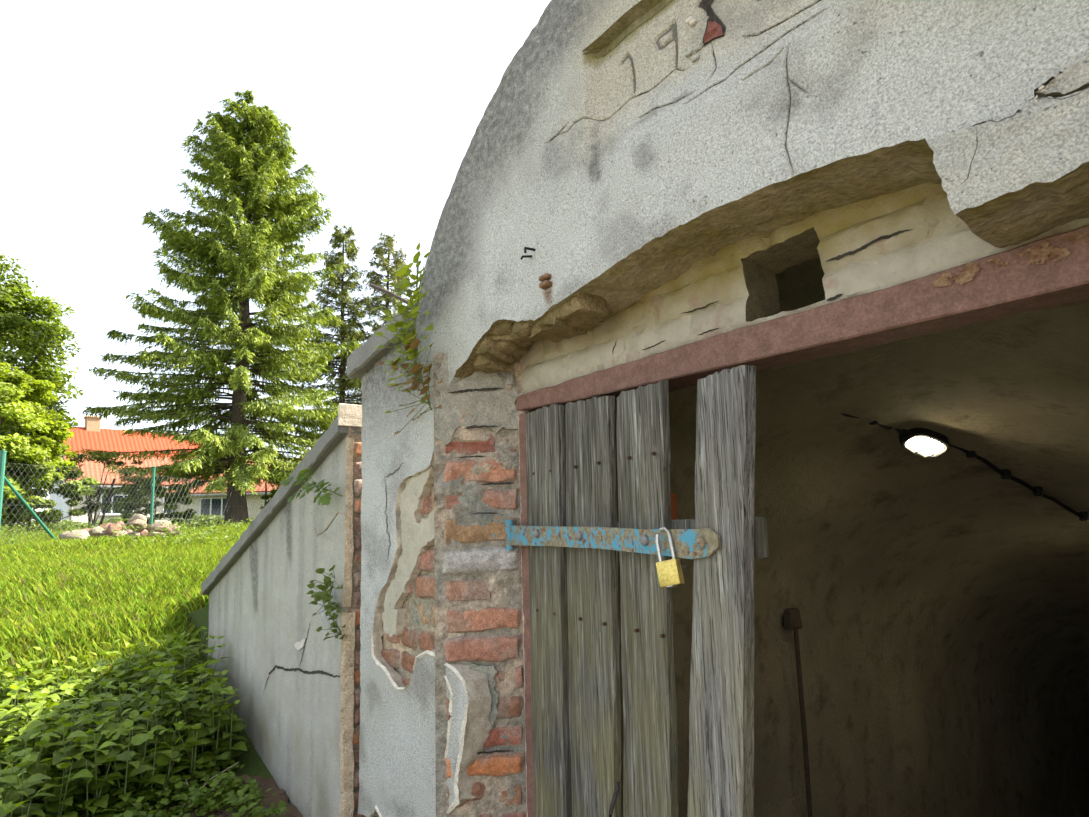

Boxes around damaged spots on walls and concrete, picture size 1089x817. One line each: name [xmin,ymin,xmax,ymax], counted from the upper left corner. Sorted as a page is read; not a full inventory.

crack [550,0,822,170]
spalling [472,293,609,373]
crack [263,623,340,693]
spalling [339,438,469,817]